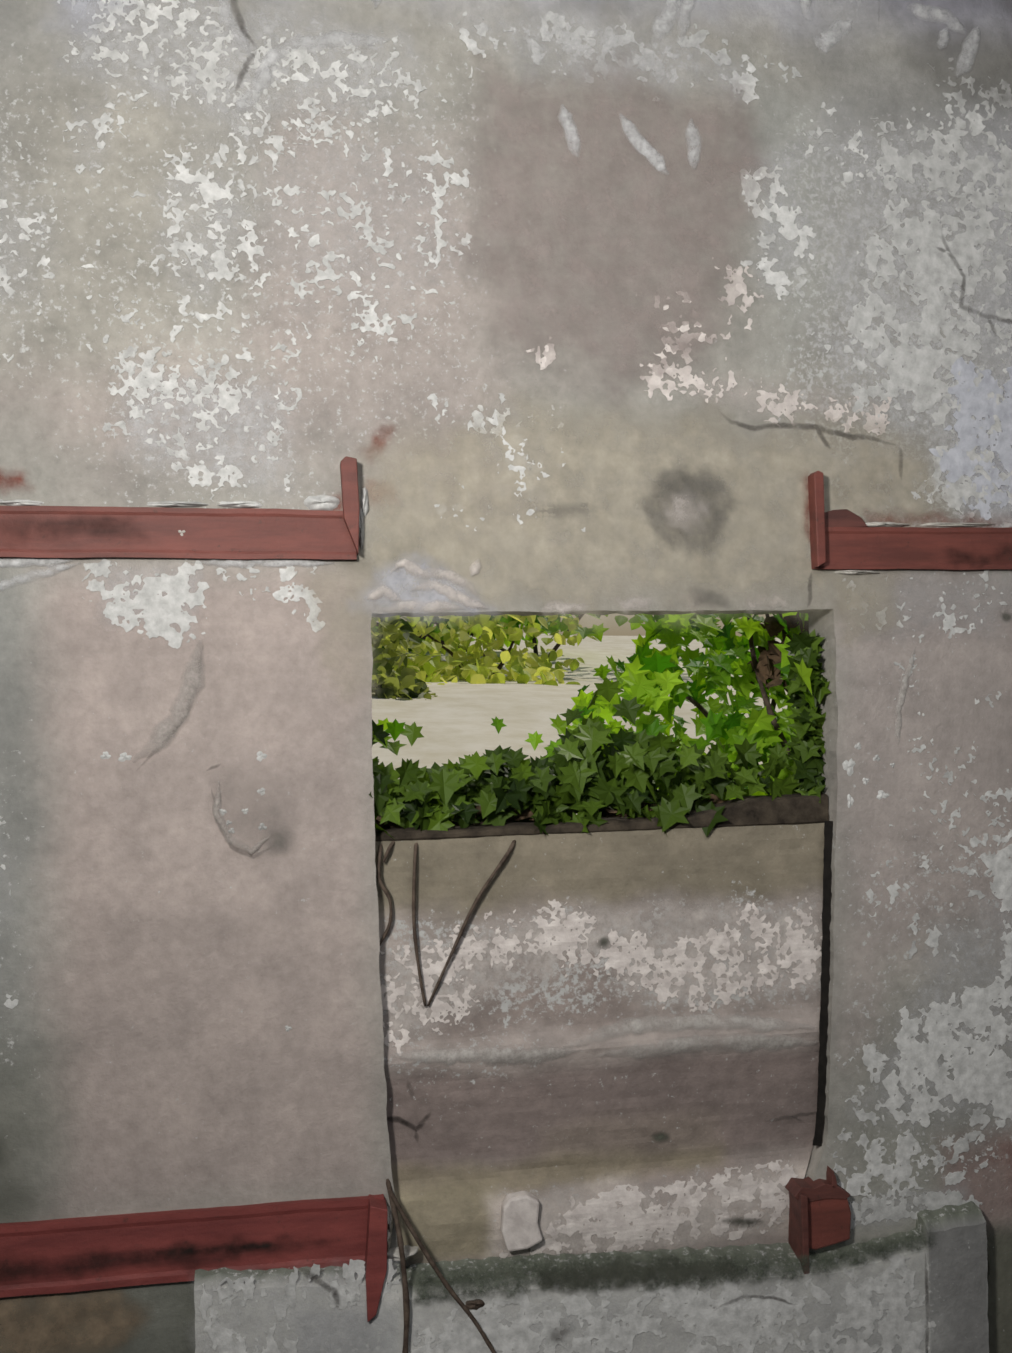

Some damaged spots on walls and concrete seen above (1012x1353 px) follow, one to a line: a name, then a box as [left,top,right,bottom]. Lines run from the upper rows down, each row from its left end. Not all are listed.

peeling [0,0,478,502]
peeling [526,337,556,370]
peeling [639,57,1012,528]
peeling [427,393,566,524]
peeling [82,559,326,649]
peeling [4,994,19,1009]
peeling [833,736,1012,1229]